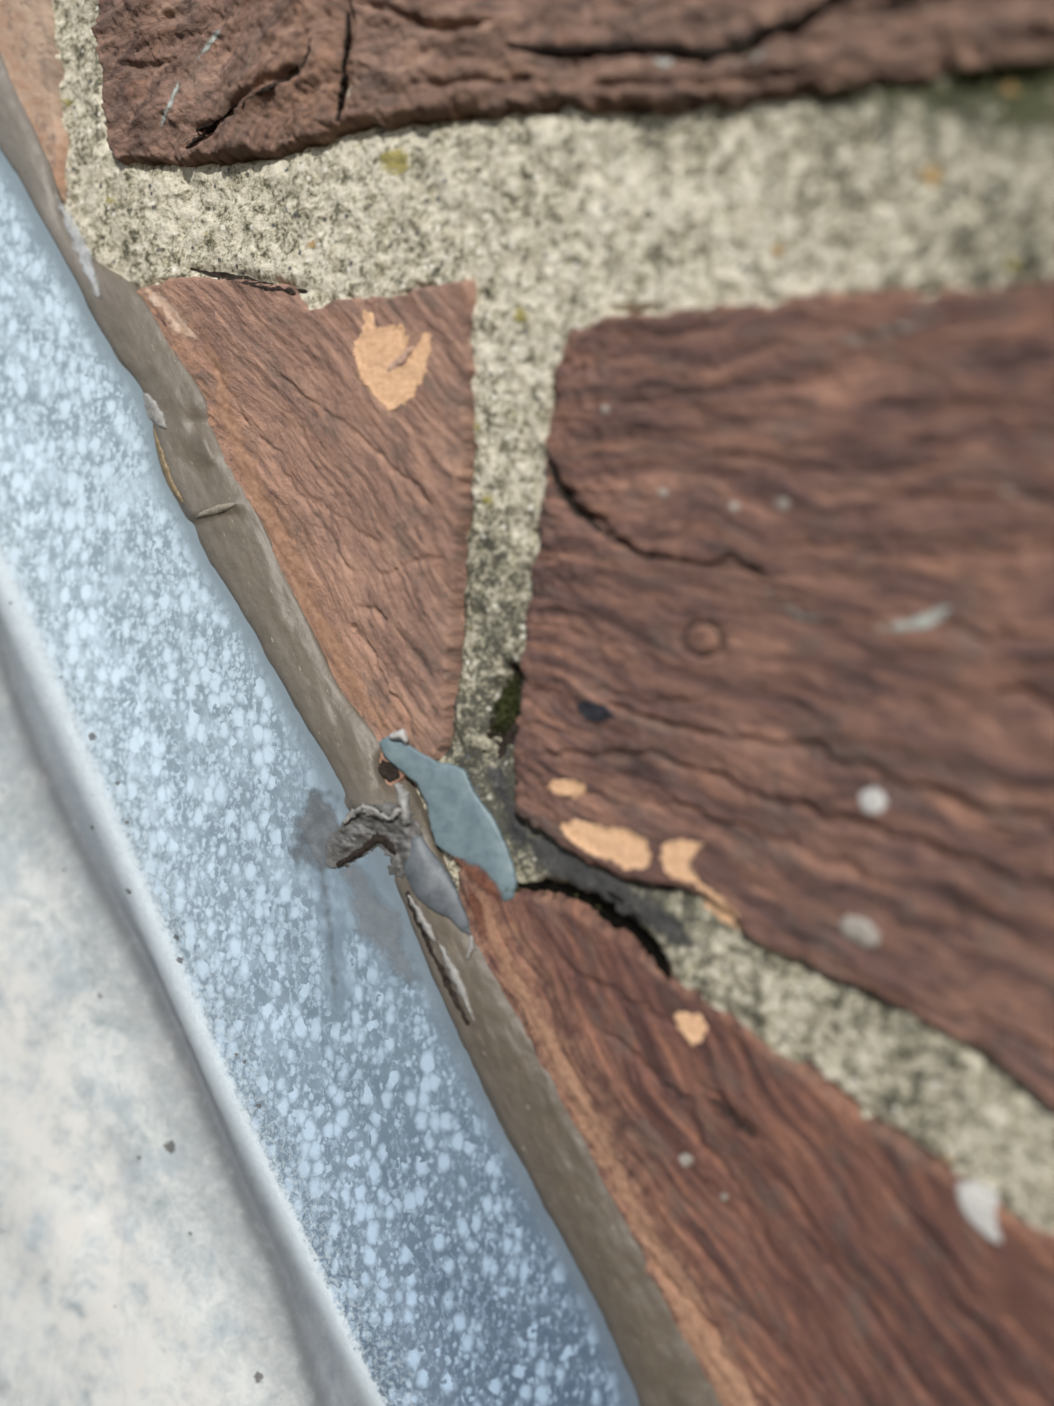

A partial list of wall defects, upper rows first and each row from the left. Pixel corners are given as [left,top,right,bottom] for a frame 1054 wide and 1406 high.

crack [186,0,352,148]
crack [508,0,842,56]
spalling [353,310,432,411]
spalling [547,779,587,800]
spalling [560,819,745,932]
crack [518,878,672,980]